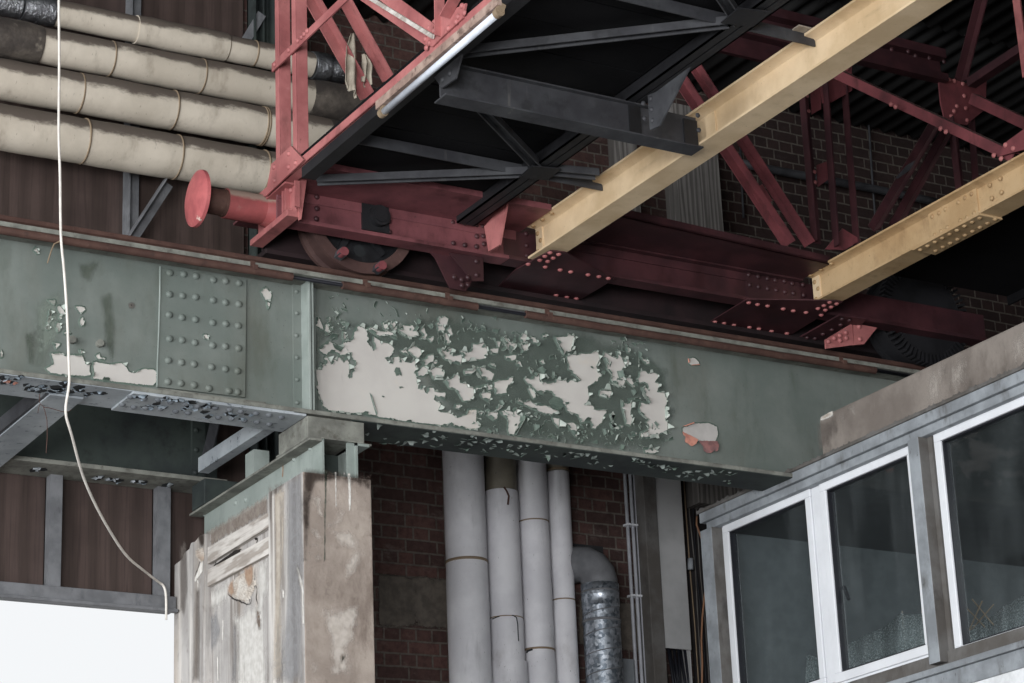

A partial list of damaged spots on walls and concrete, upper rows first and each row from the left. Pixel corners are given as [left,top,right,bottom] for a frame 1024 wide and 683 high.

peeling [0,298,255,422]
peeling [314,315,736,484]
spalling [230,566,256,603]